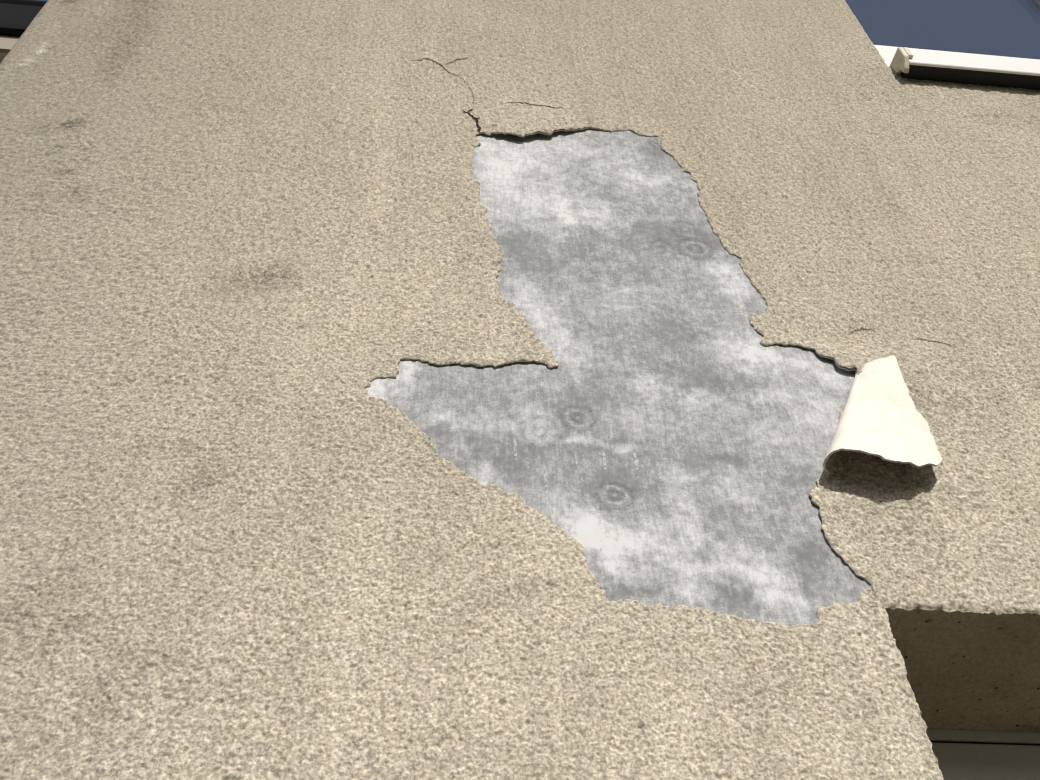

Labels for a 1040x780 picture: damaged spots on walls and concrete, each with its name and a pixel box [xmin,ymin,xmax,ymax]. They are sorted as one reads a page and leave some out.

crack [410,53,574,131]
peeling [365,128,942,627]